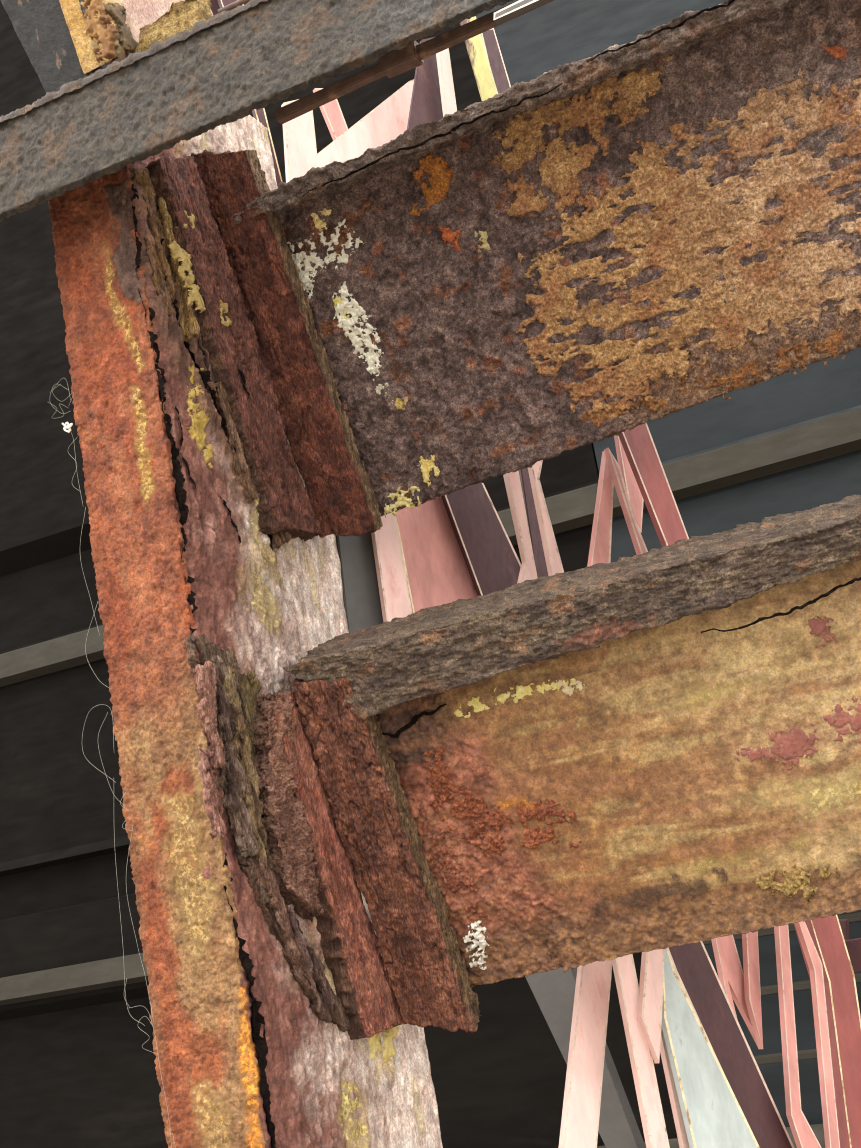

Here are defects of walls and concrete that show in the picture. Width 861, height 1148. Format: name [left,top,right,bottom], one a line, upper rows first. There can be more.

corrosion [105,252,144,373]
corrosion [129,167,260,503]
corrosion [409,154,454,216]
corrosion [491,55,861,427]
crack [131,184,250,659]
crack [701,577,861,633]
crack [382,703,447,738]
corrosion [162,633,351,1032]
corrosion [411,739,582,924]
corrosion [755,863,839,902]
corrosion [192,1082,230,1148]
corrosion [239,987,262,1148]